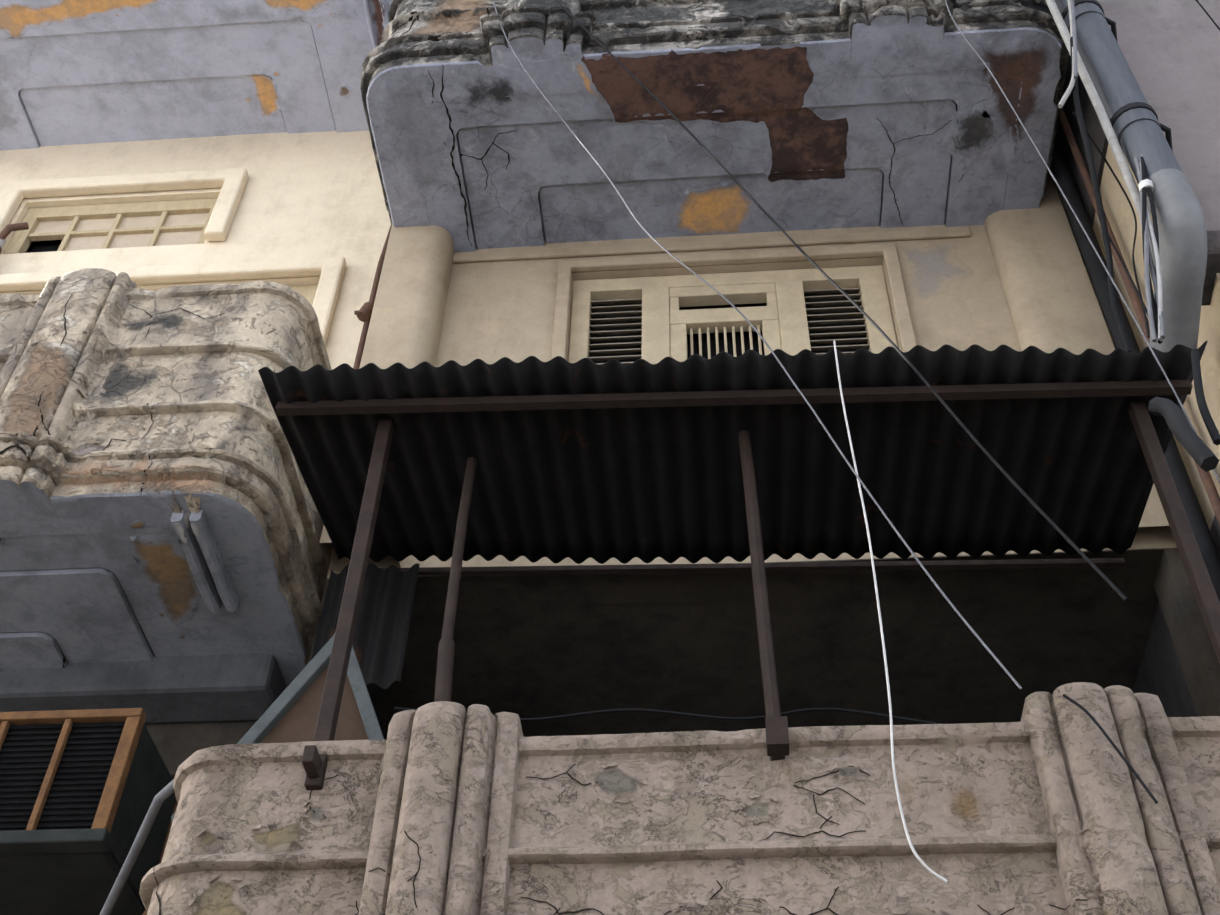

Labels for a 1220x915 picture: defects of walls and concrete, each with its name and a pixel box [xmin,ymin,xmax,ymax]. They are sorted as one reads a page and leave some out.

peeling [0,0,162,44]
peeling [262,0,341,28]
peeling [244,71,282,132]
crack [391,11,518,247]
spalling [568,45,852,235]
peeling [191,827,227,854]
peeling [241,799,332,853]
crack [759,766,870,841]
peeling [172,873,257,915]
crack [779,886,839,915]